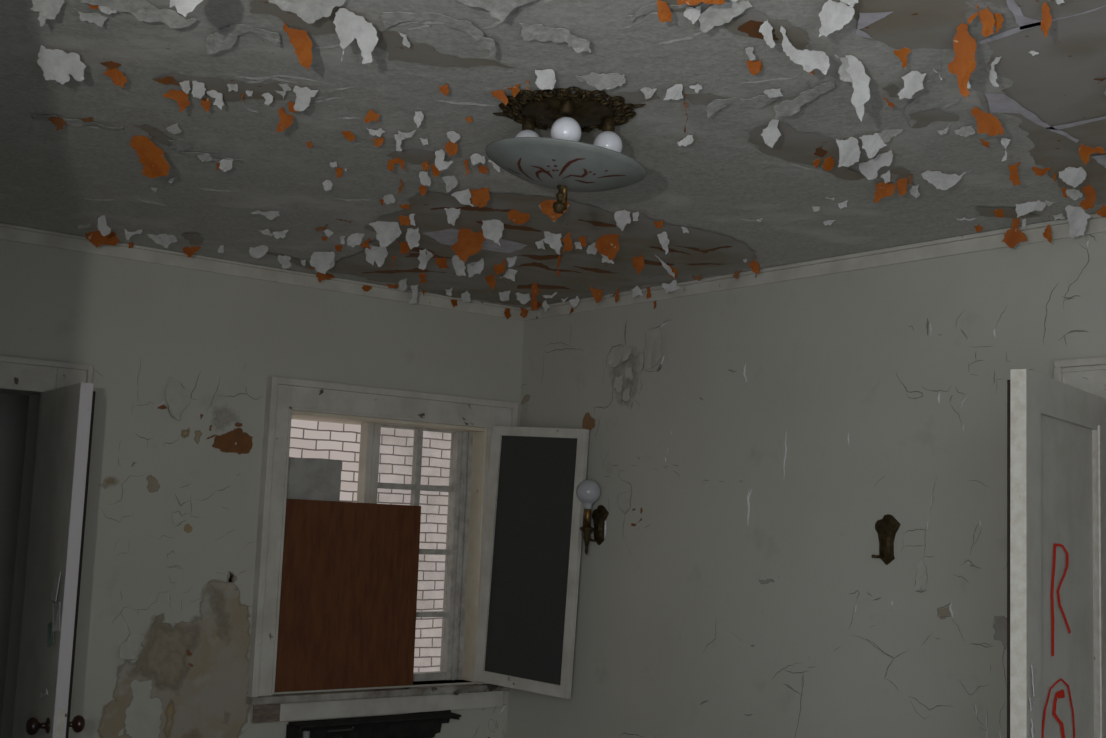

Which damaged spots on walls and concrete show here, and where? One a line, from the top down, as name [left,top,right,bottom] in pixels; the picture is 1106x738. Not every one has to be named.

peeling [37,45,86,85]
peeling [100,61,127,89]
peeling [30,0,203,28]
peeling [130,0,593,192]
flaking render [491,0,1106,248]
peeling [77,215,204,258]
flaking render [249,109,760,320]
crack [1043,240,1089,345]
crack [896,308,1033,431]
flaking render [207,422,253,455]
flaking render [98,570,251,738]